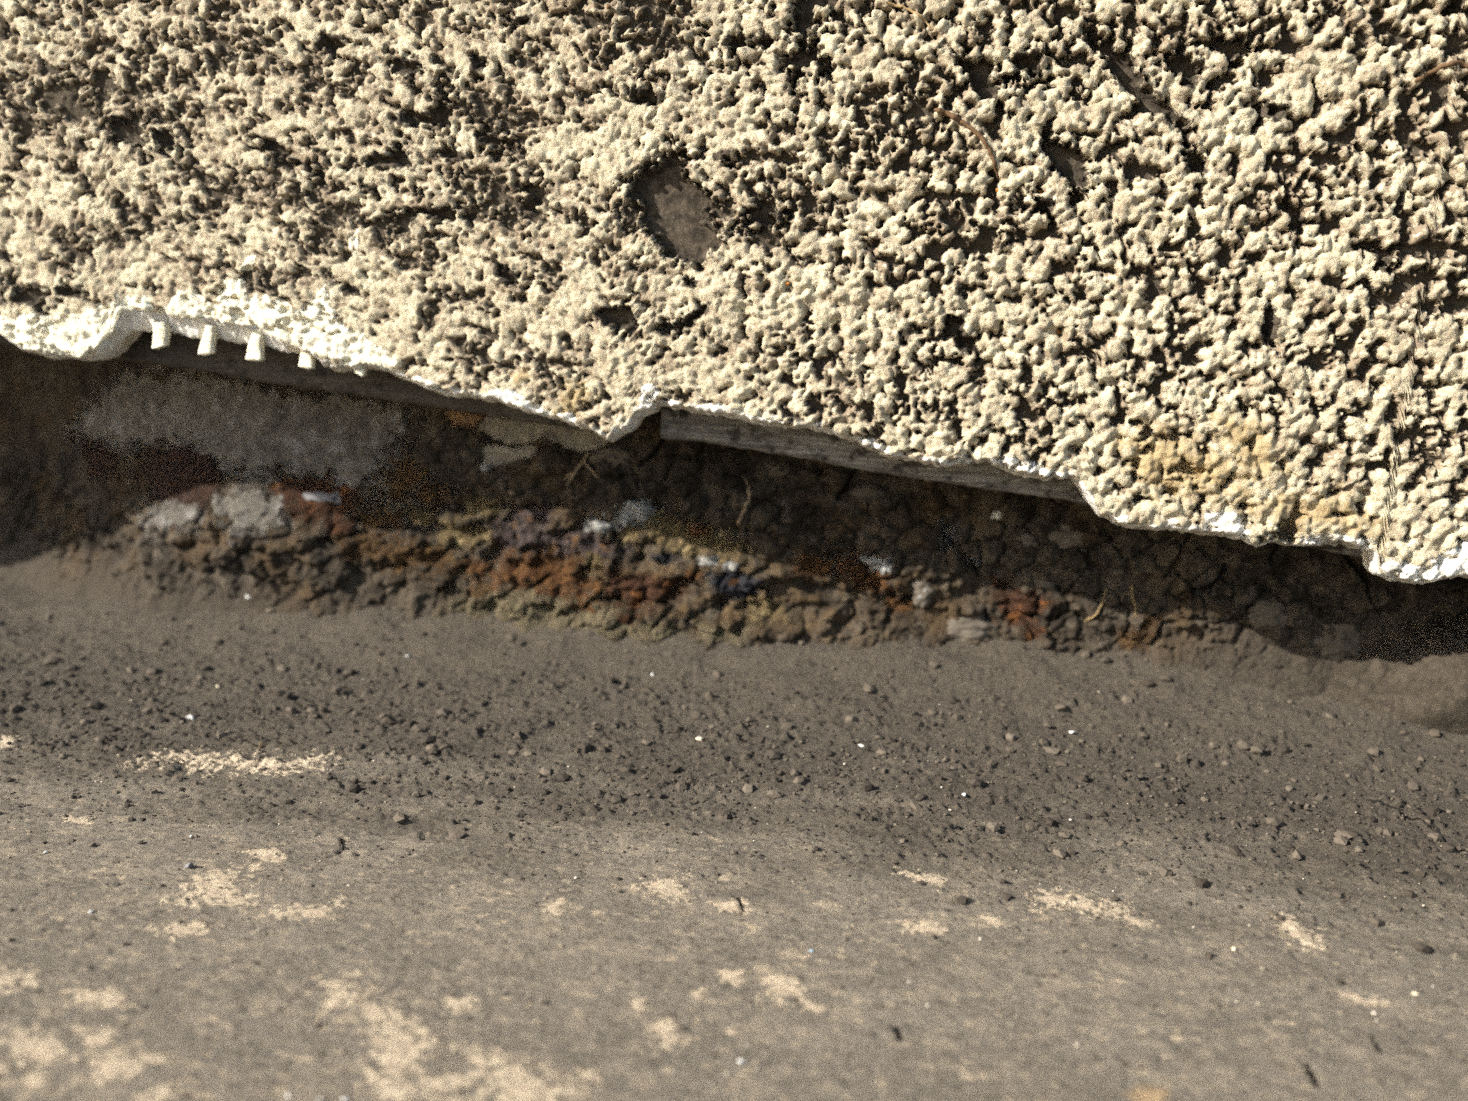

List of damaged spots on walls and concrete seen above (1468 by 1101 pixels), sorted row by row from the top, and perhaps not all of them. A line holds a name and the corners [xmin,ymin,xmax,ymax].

flaking render [524,184,549,211]
flaking render [348,228,359,258]
flaking render [494,264,521,288]
flaking render [0,255,439,389]
flaking render [482,388,577,424]